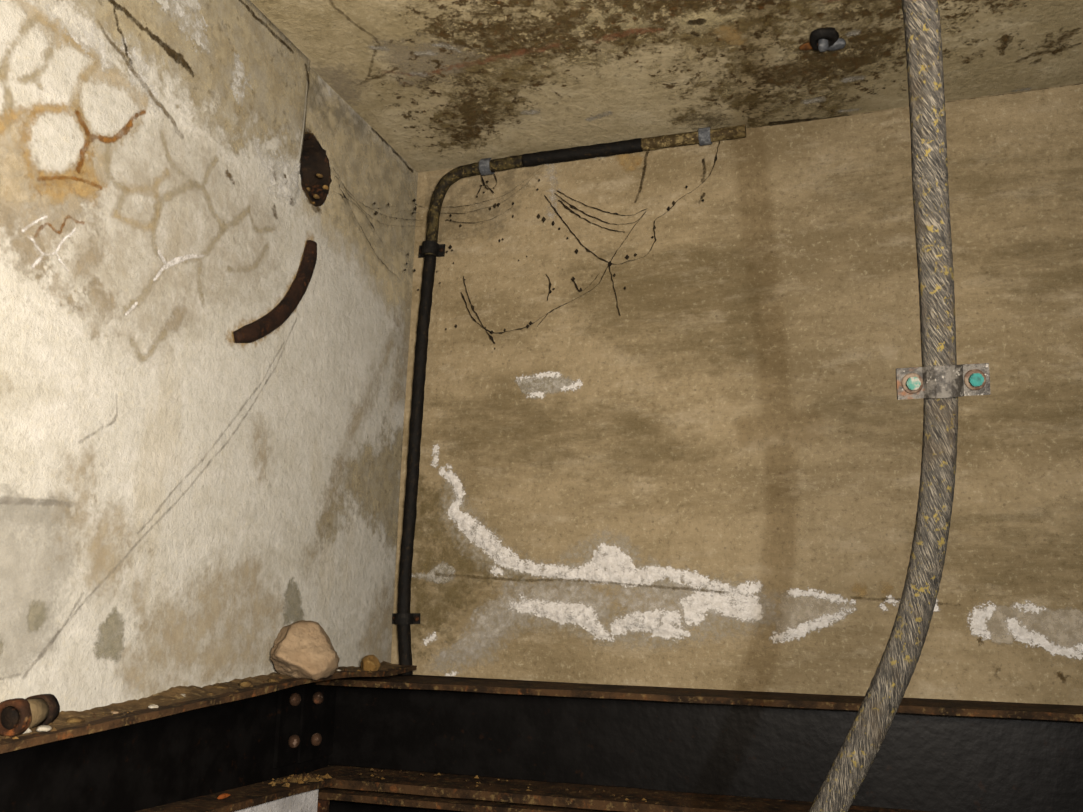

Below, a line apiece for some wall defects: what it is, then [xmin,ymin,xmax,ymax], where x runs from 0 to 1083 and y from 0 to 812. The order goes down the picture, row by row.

crack [239,0,310,132]
damp [938,0,1079,64]
crack [0,0,274,361]
damp [0,0,907,261]
crack [635,151,649,203]
corrosion [229,236,317,346]
damp [317,429,403,555]
damp [95,561,304,693]
damp [363,582,395,662]
damp [411,444,857,676]
damp [880,595,898,611]
damp [967,600,1083,660]